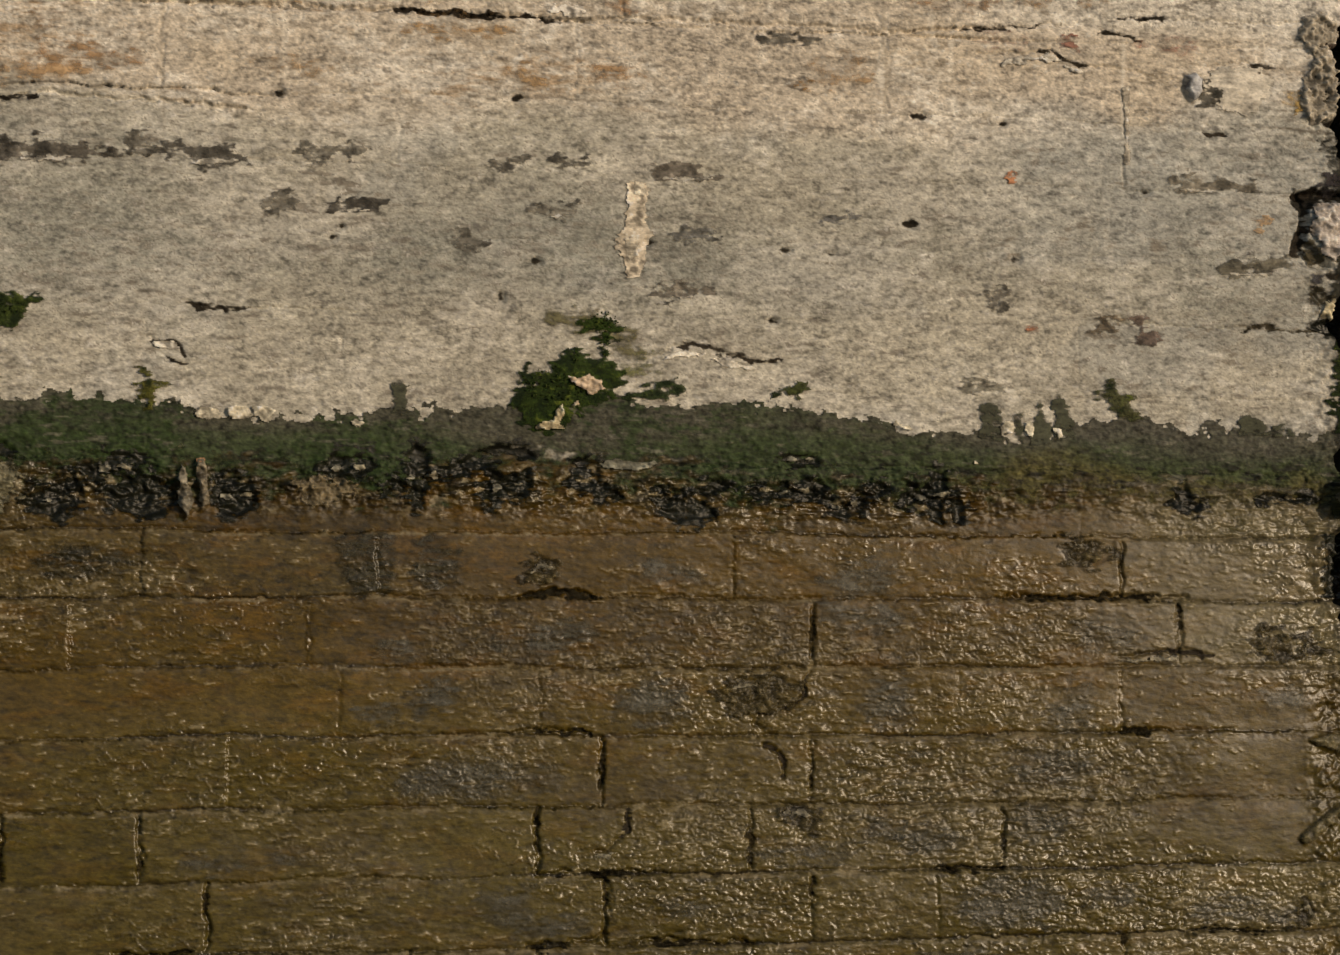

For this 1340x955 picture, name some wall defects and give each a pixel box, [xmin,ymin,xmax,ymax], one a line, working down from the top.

crack [962,24,1088,73]
crack [1098,16,1165,43]
crack [0,93,39,102]
peeling [614,161,724,278]
spalling [649,279,717,305]
crack [662,341,783,371]
crack [1241,323,1325,337]
spalling [0,442,267,529]
spalling [290,437,541,516]
spalling [562,450,657,506]
spalling [648,451,978,532]
crack [581,808,640,911]